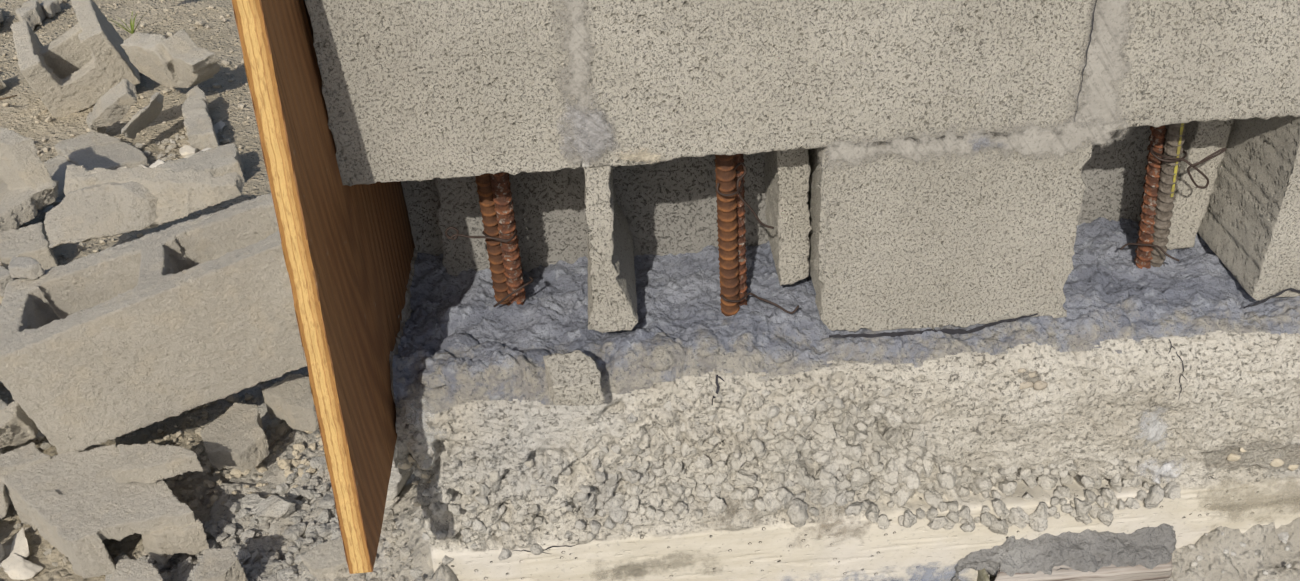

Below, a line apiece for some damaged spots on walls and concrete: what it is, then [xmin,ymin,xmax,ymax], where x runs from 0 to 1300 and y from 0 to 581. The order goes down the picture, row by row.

crack [1168,339,1187,396]